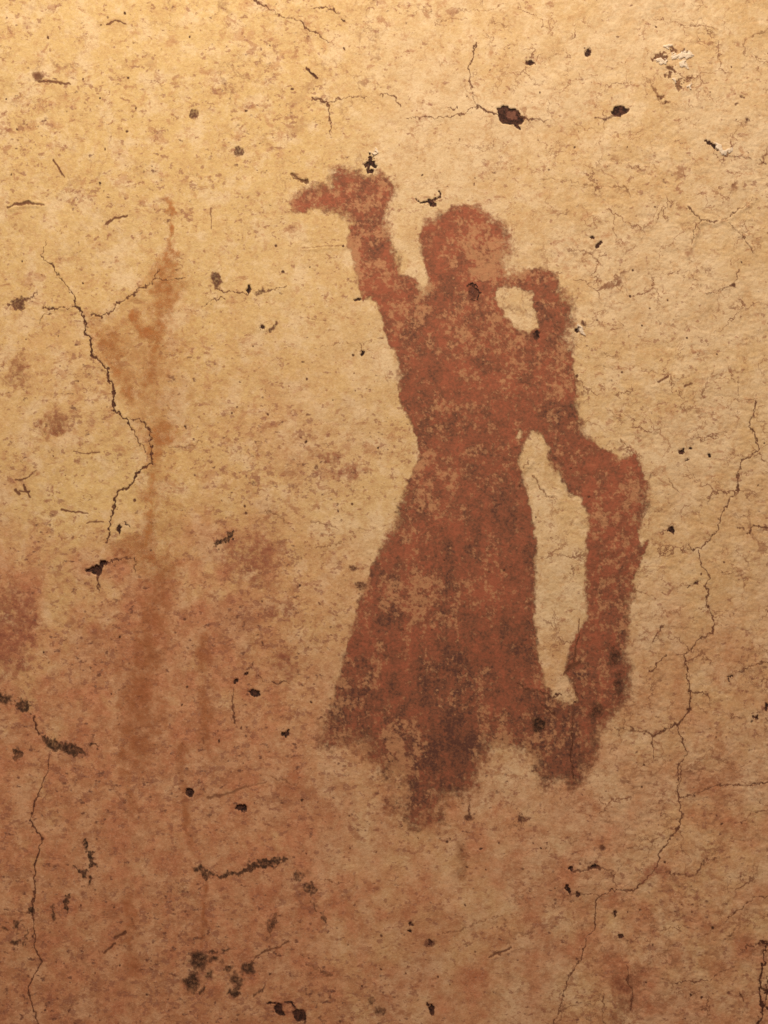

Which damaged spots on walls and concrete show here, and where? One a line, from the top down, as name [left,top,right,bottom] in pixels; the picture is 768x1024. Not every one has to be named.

crack [311,42,547,133]
spalling [651,44,694,91]
crack [40,248,182,591]
crack [552,401,768,1024]
crack [4,716,50,1024]